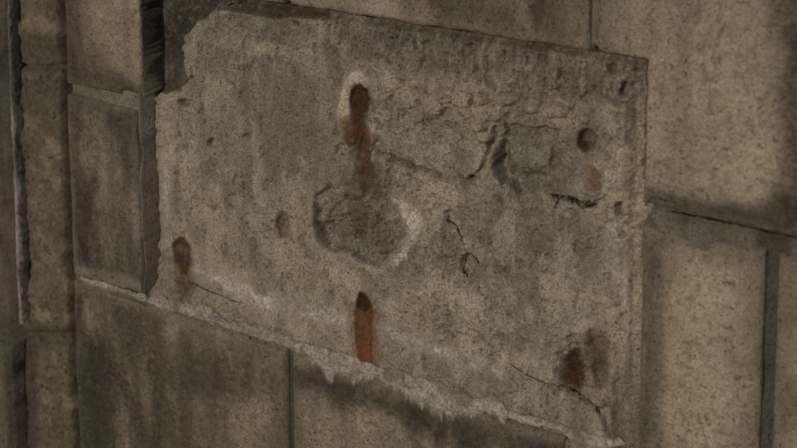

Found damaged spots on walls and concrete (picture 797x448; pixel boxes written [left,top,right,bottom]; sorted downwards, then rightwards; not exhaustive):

spalling [155,0,331,96]
corrosion [341,84,372,165]
spalling [310,165,411,271]
damp [386,198,424,267]
crack [447,213,479,277]
crack [550,194,603,209]
damp [191,268,289,312]
damp [75,277,625,448]
corrosion [353,292,376,363]
crack [508,363,611,438]
corrosion [562,351,584,388]
spalling [551,326,618,413]